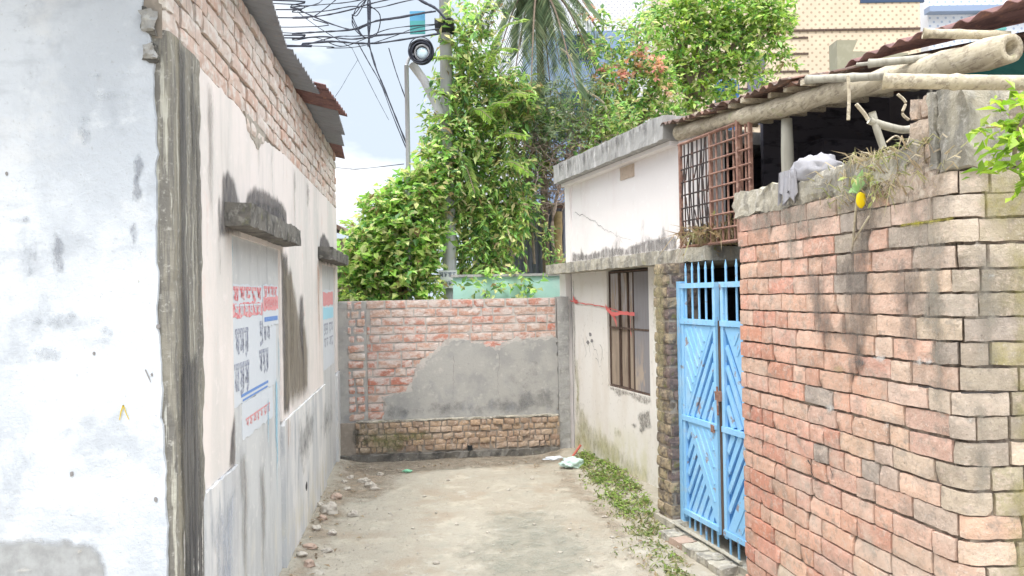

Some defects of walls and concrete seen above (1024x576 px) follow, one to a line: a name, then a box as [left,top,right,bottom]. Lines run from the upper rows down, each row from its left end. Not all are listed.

spalling [243,111,267,150]
damp [219,173,287,234]
damp [268,256,308,444]
spalling [347,298,555,421]